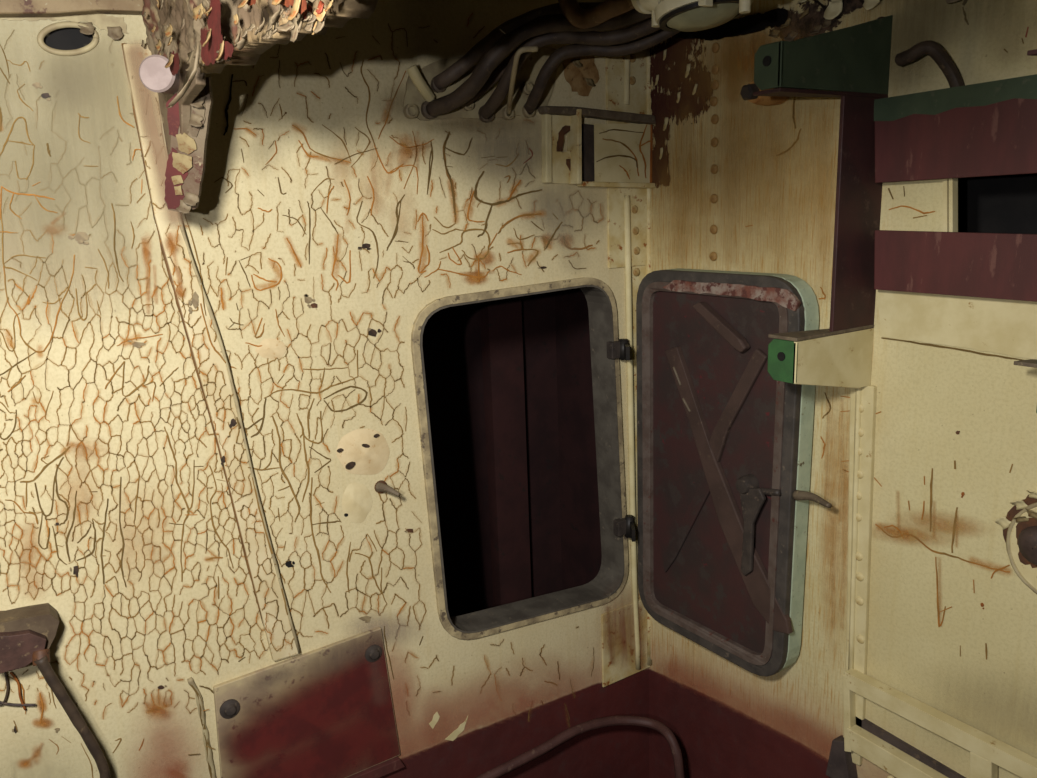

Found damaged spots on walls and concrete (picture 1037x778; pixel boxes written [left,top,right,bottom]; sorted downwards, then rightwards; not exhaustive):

peeling [141,0,334,108]
peeling [562,56,600,96]
crack [117,96,142,194]
crack [596,125,651,179]
crack [0,45,135,451]
crack [185,60,593,369]
crack [105,334,179,402]
crack [0,446,139,587]
crack [164,427,234,599]
crack [236,350,394,679]
peeling [995,491,1037,542]